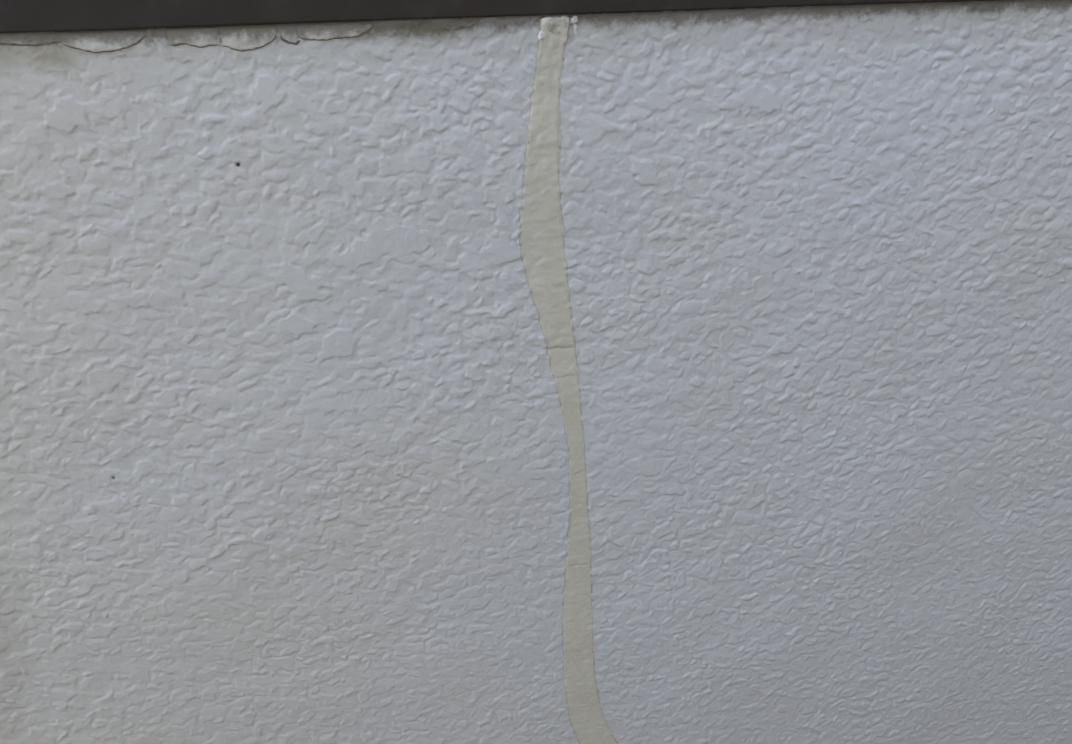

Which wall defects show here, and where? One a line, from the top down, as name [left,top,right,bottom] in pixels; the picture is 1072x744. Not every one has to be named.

crack [0,39,58,47]